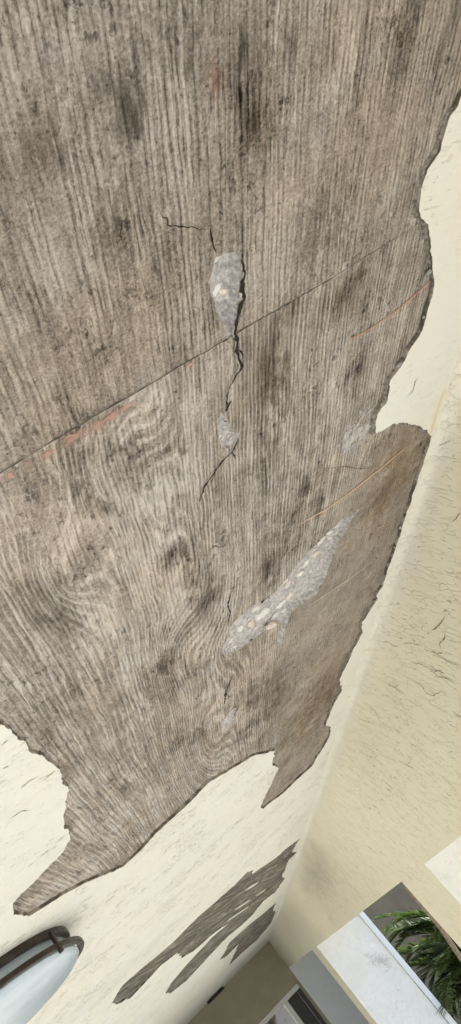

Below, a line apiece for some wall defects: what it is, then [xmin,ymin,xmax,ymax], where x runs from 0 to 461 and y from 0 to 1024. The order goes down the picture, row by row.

crack [160,212,246,412]
peeling [0,0,461,471]
peeling [0,224,432,917]
crack [198,440,238,503]
peeling [112,839,300,1005]